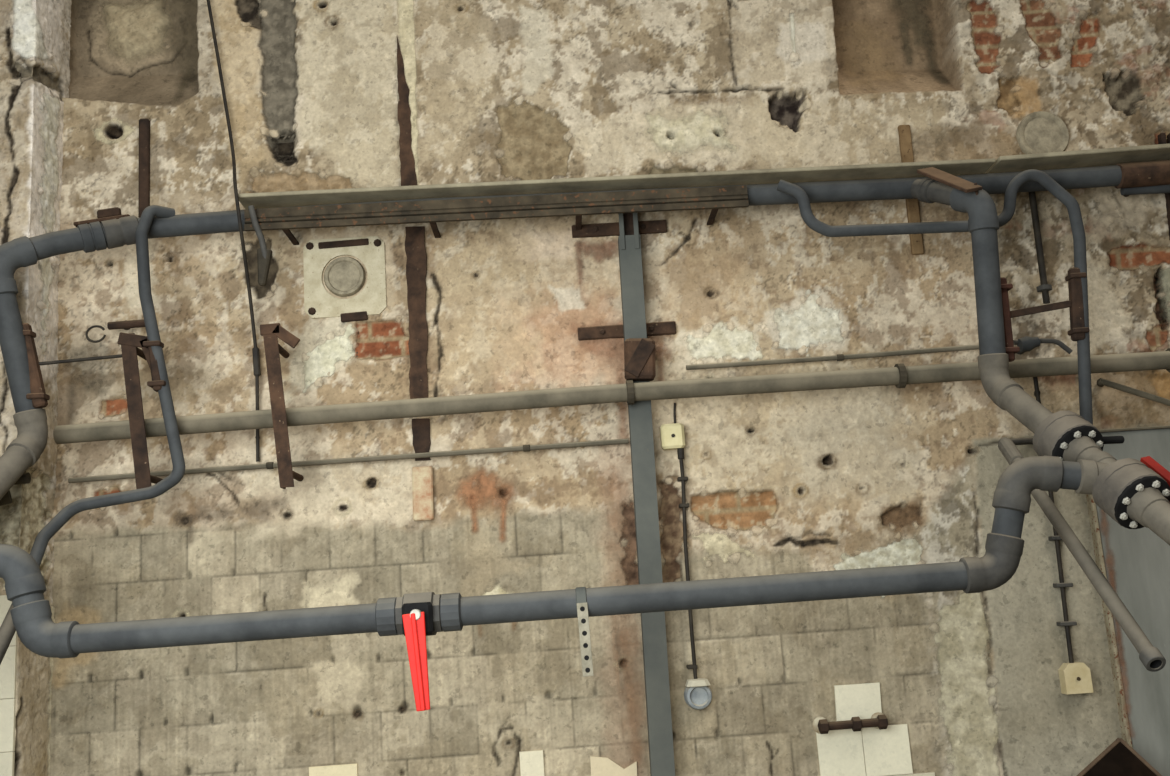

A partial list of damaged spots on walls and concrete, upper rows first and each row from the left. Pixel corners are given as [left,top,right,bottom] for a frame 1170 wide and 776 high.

crack [2,28,22,244]
spalling [236,0,299,168]
spalling [769,88,812,133]
flaking render [966,0,1021,116]
flaking render [1020,0,1100,68]
spalling [1103,67,1147,119]
flaking render [1108,242,1170,352]
corrosion [458,472,511,540]
flaking render [658,476,778,583]
peeling [829,503,925,571]
spalling [834,683,882,728]
spalling [590,756,637,776]